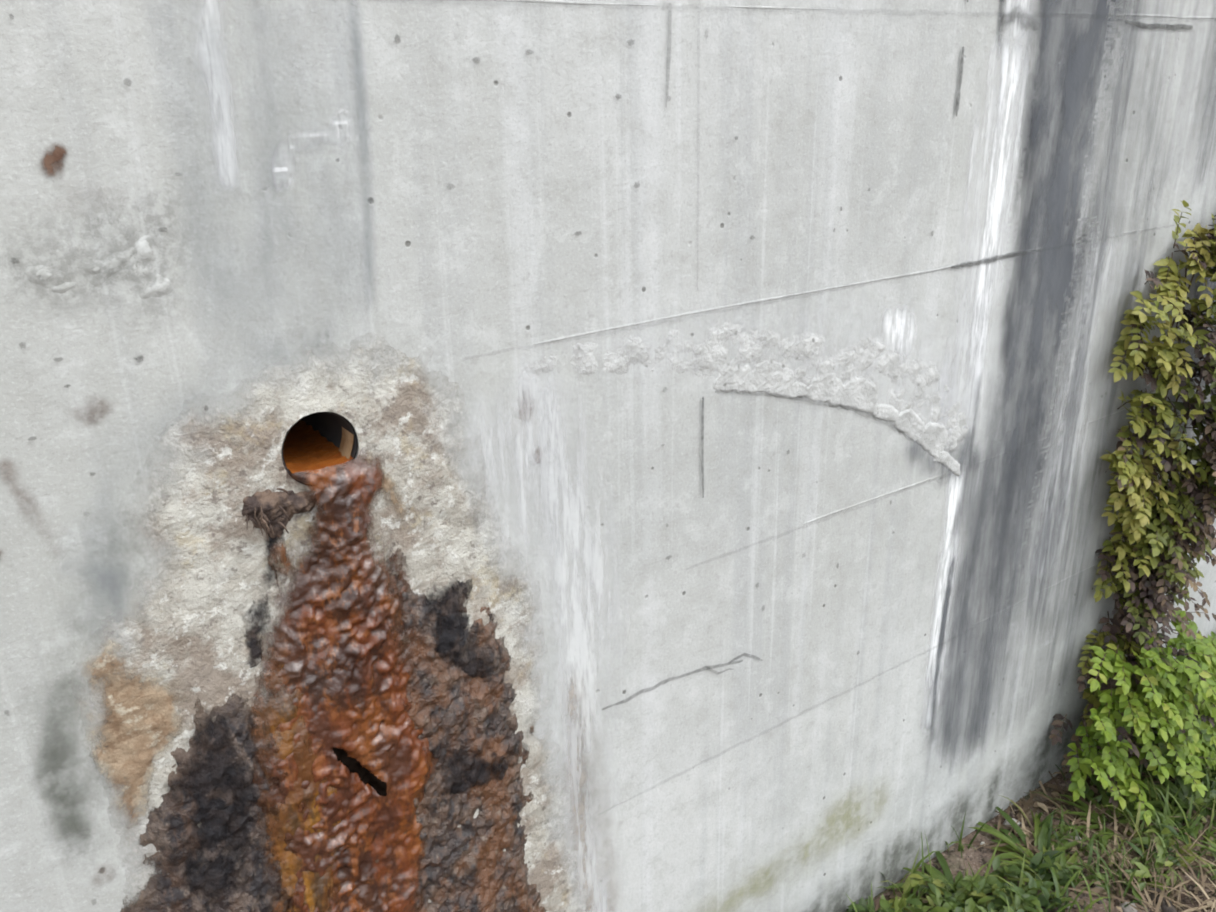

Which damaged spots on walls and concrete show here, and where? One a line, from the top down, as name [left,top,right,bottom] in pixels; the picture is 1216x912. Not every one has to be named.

corrosion [42,145,67,175]
corrosion [81,341,585,912]
damp [926,0,1124,744]
damp [1192,268,1216,330]